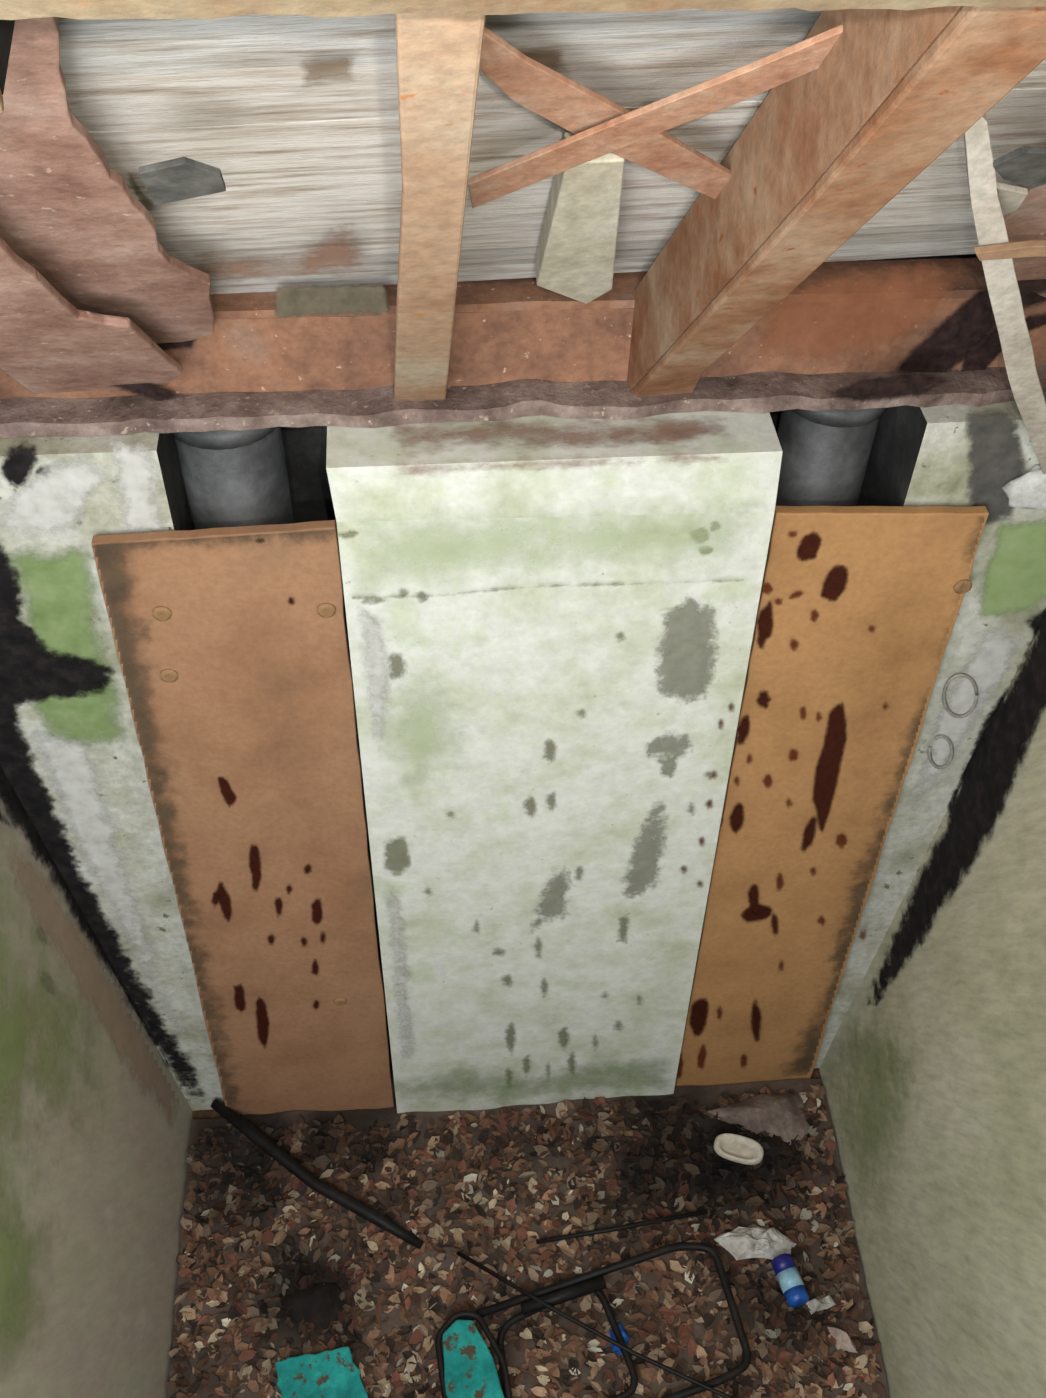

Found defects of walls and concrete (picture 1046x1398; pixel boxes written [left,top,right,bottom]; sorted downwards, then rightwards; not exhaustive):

damp [2,444,50,486]
damp [789,532,821,561]
damp [656,599,717,701]
damp [757,584,802,648]
damp [811,566,848,622]
damp [737,692,771,763]
damp [0,546,203,1097]
damp [385,839,410,874]
damp [800,704,847,851]
damp [869,610,1046,1005]
damp [742,885,778,934]
damp [676,1000,722,1077]